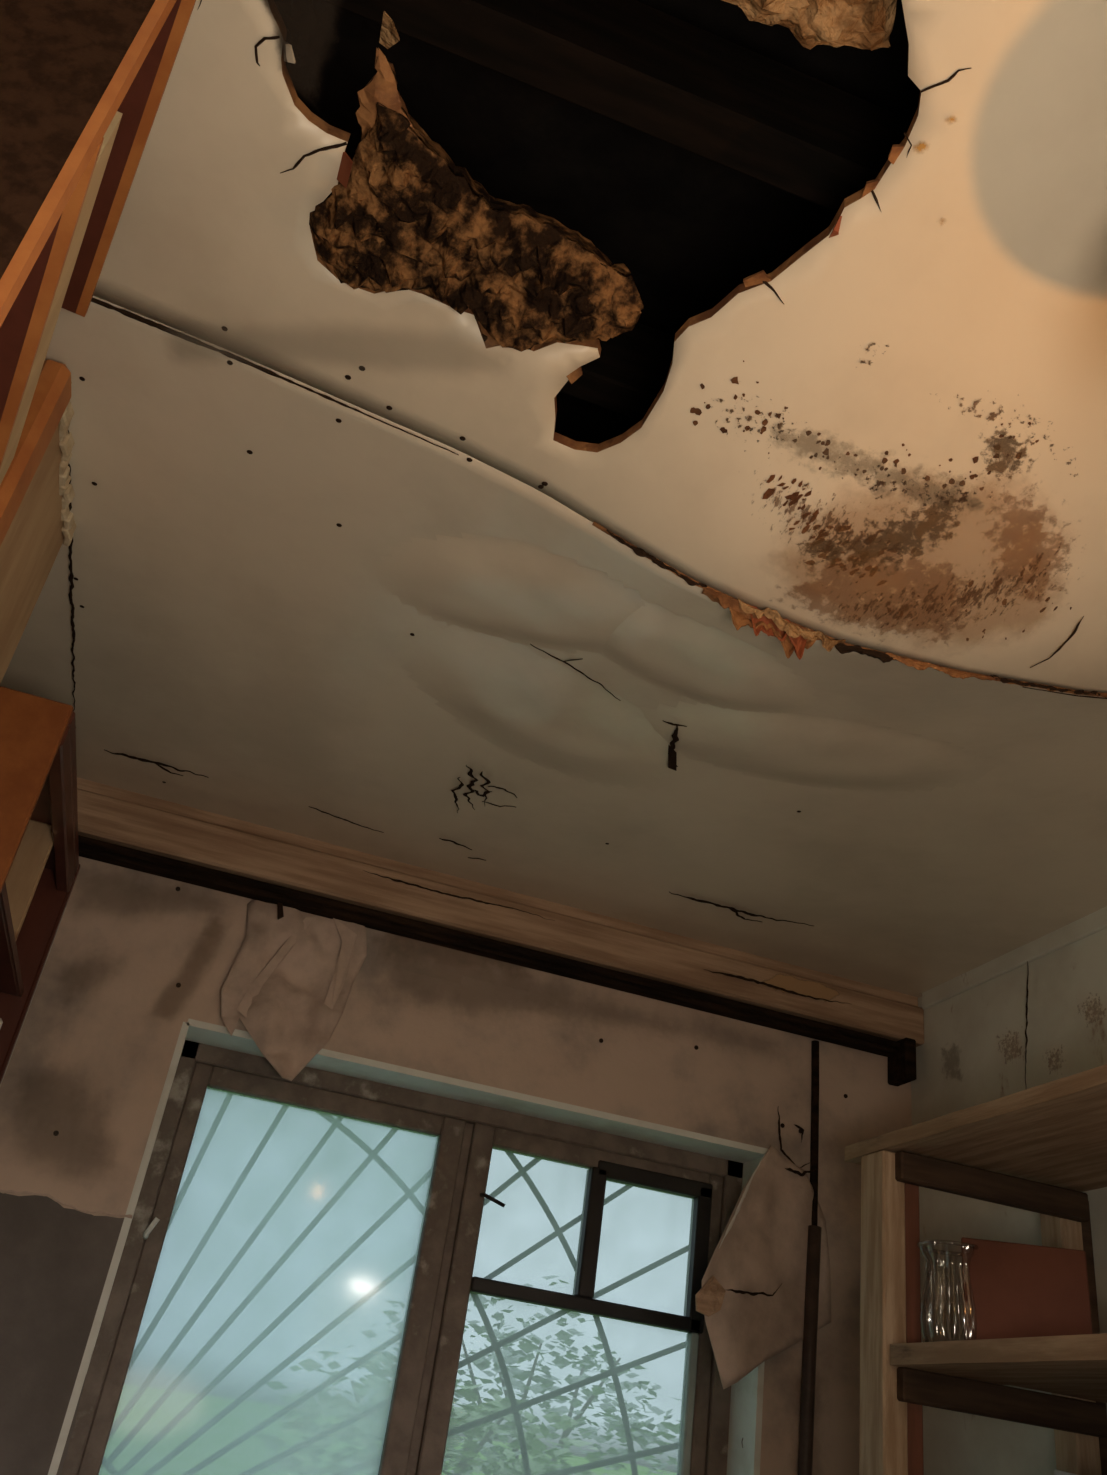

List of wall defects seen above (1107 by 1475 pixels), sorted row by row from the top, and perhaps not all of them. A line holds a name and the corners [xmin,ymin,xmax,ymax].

peeling [379,11,400,49]
crack [254,36,280,66]
peeling [286,44,296,64]
crack [921,68,971,93]
crack [281,142,348,173]
peeling [337,152,353,188]
peeling [888,144,905,164]
peeling [861,179,880,198]
crack [871,190,881,211]
peeling [743,270,771,287]
peeling [566,366,583,384]
flaking render [0,1189,133,1475]